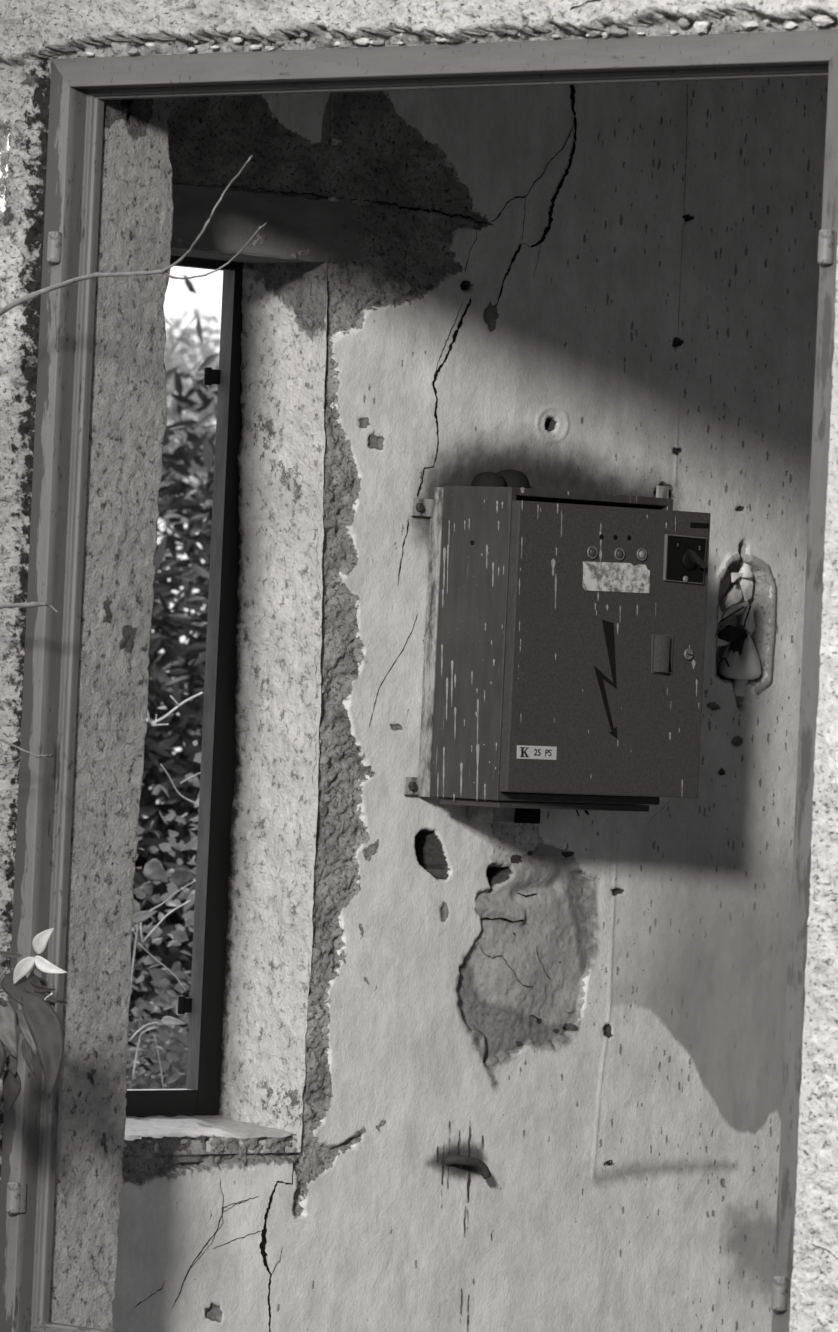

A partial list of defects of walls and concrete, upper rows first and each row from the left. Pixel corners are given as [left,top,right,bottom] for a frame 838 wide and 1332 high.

leakage [0,56,51,968]
spalling [101,91,490,1218]
crack [177,85,577,582]
crack [133,1137,294,1332]
spalling [456,842,597,1086]
leakage [665,927,790,1132]